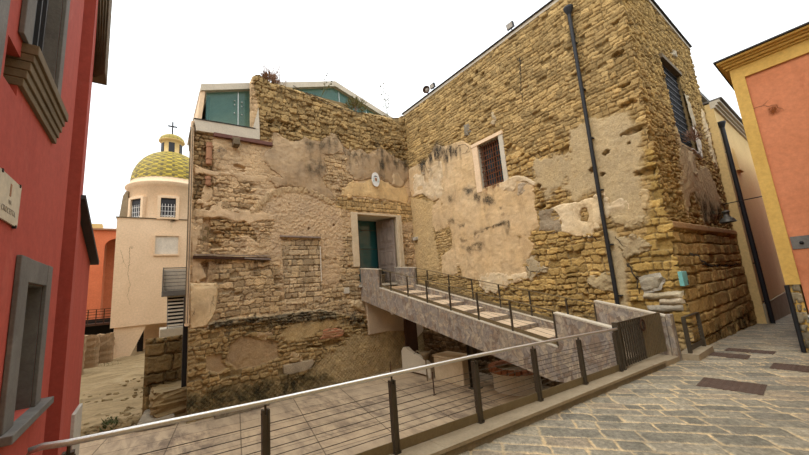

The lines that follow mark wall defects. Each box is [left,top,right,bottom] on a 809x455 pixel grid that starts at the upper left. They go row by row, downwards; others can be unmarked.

peeling [189,186,273,329]
peeling [194,132,539,294]
peeling [550,191,629,240]